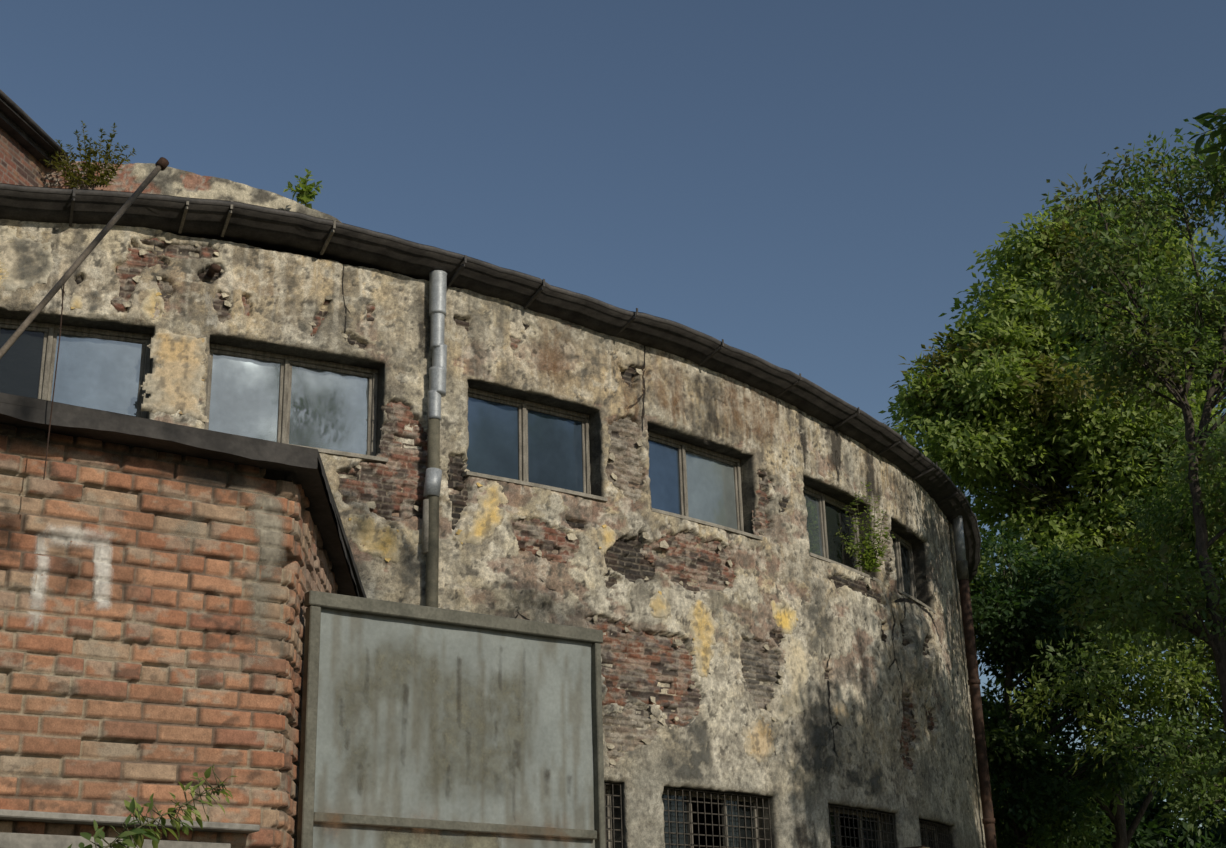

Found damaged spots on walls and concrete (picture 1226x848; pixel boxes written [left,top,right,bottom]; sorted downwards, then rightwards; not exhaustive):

peeling [111,238,250,422]
spalling [338,401,428,565]
spalling [605,416,646,504]
spalling [446,455,736,768]
spalling [740,600,830,763]
spalling [899,695,935,770]